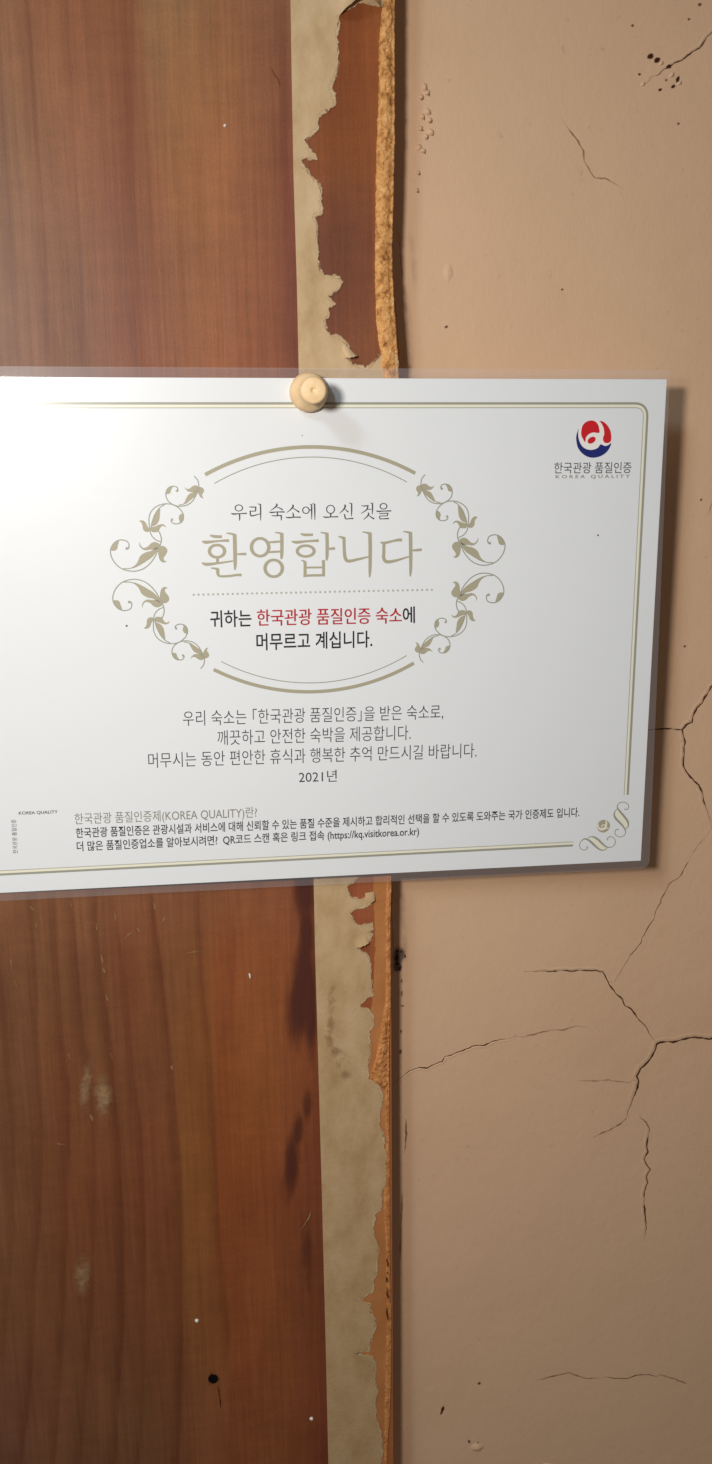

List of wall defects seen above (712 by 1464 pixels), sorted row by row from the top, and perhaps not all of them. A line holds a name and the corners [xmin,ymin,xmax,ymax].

crack [640,28,712,83]
crack [648,682,712,831]
crack [393,1029,566,1086]
crack [523,864,712,1238]